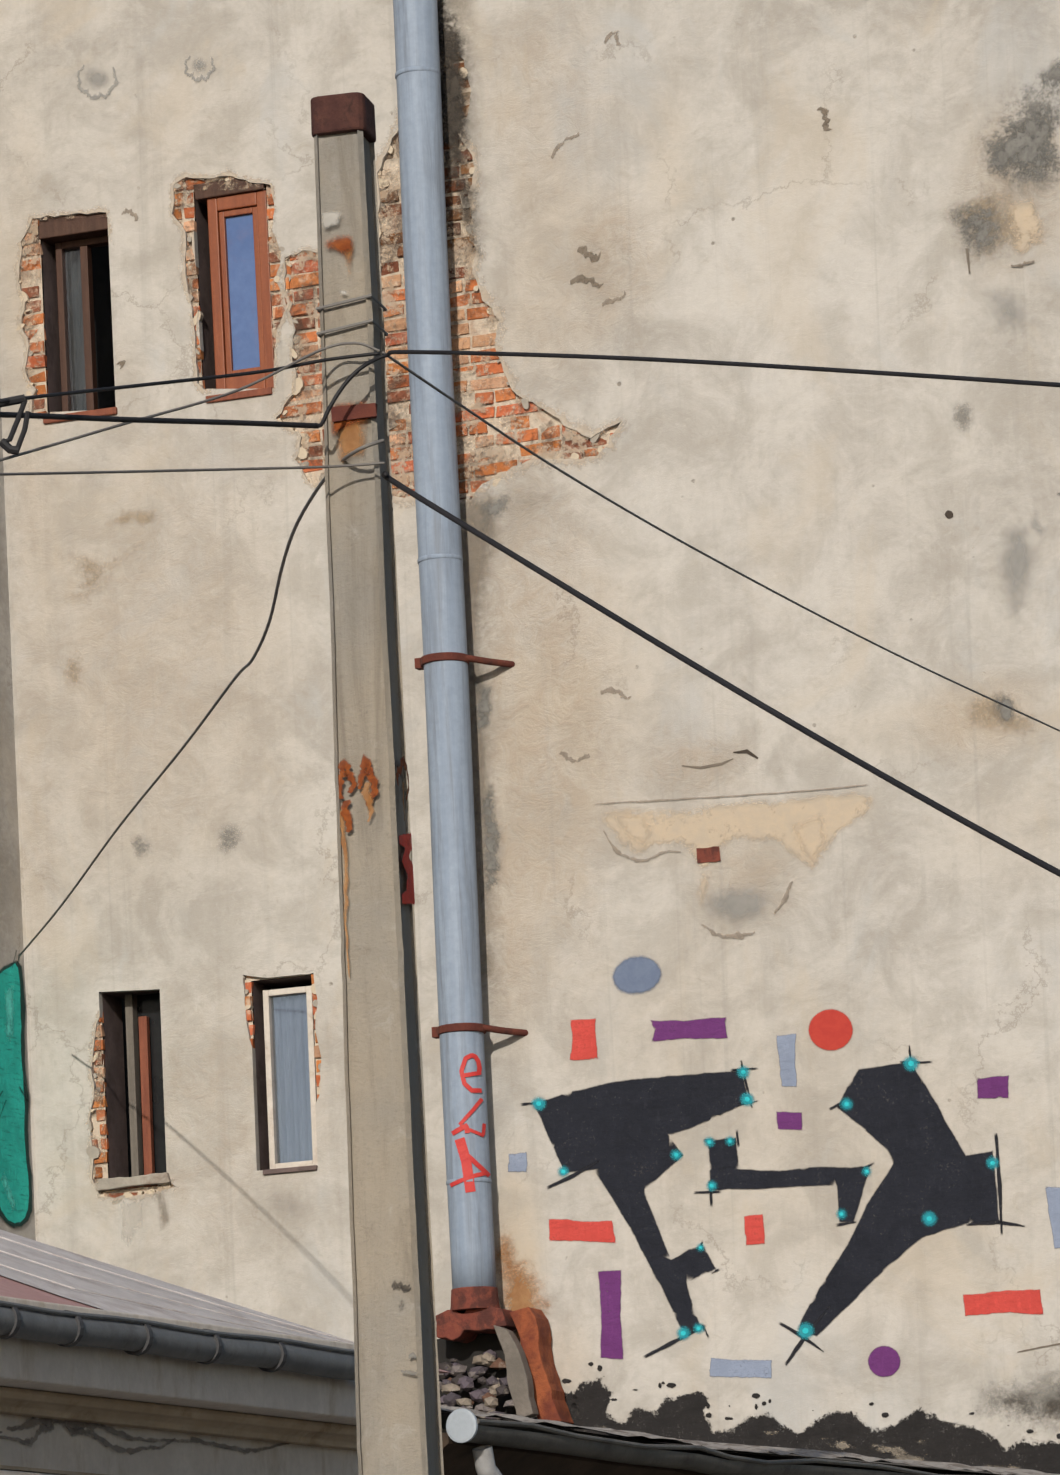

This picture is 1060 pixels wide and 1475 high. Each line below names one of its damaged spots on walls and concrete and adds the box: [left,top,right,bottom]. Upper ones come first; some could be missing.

flaking render [15,208,111,414]
flaking render [169,171,325,488]
flaking render [375,117,415,504]
flaking render [442,56,624,505]
rust [338,754,379,976]
rust [396,757,409,821]
peeling [596,784,871,892]
flaking render [86,1011,175,1205]
flaking render [243,974,321,1100]
rust [497,1243,548,1311]
water stain [995,1387,1060,1414]